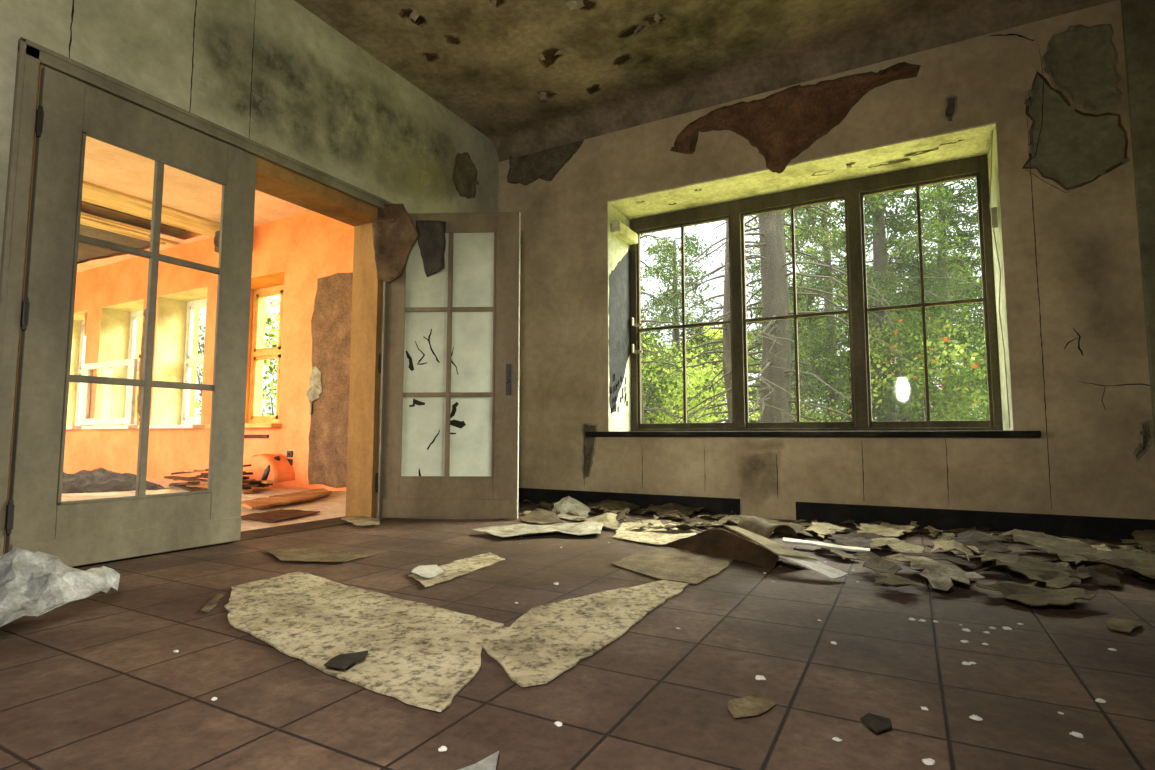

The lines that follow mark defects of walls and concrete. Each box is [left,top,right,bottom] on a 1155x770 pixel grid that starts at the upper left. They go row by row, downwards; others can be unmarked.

spalling [399,8,428,27]
spalling [565,0,598,11]
spalling [616,13,666,40]
spalling [537,48,563,68]
spalling [613,53,632,70]
flaking render [670,62,921,174]
flaking render [452,152,479,199]
flaking render [811,138,963,176]
peeling [608,250,631,414]
crack [1064,328,1150,410]
flaking render [1132,420,1154,461]